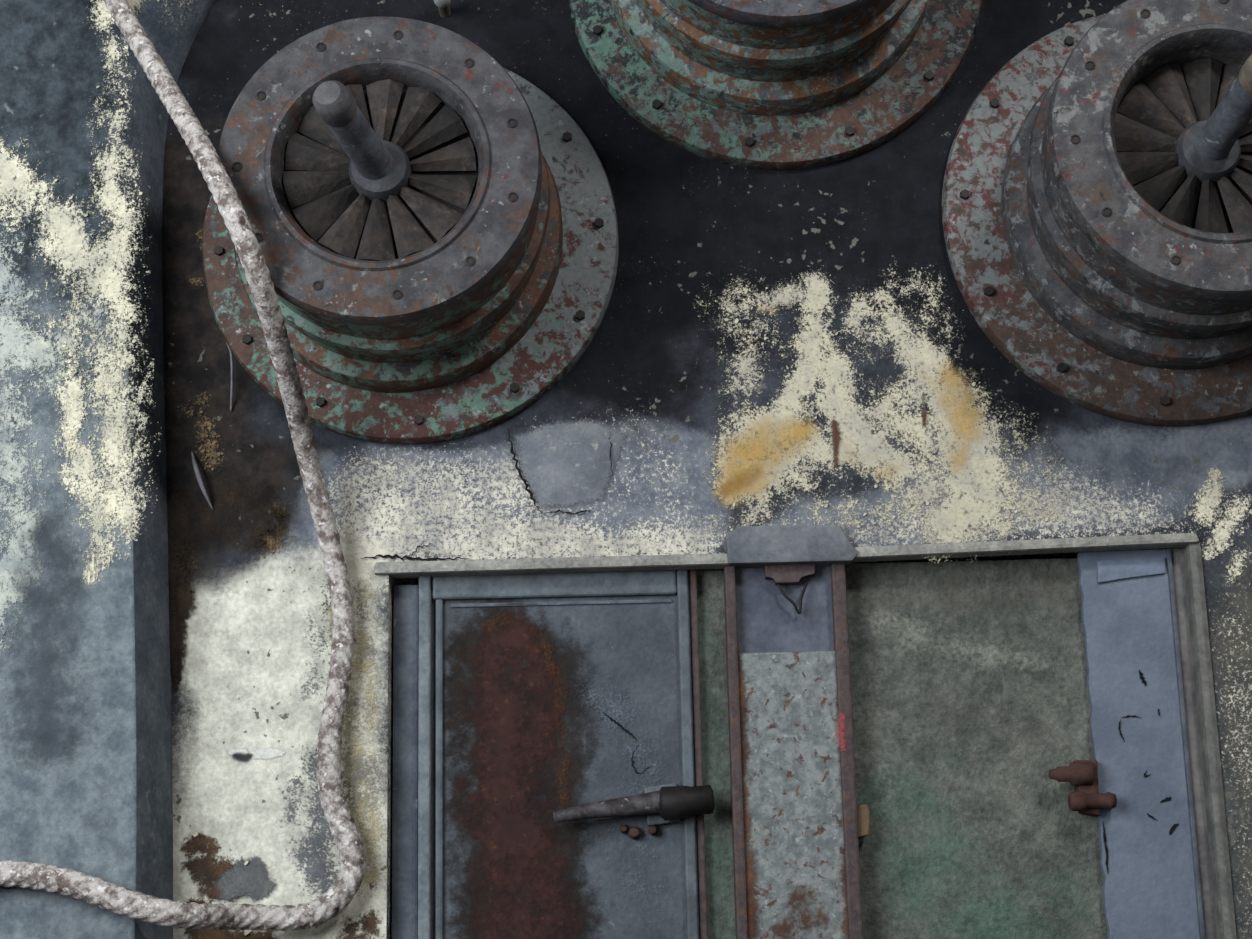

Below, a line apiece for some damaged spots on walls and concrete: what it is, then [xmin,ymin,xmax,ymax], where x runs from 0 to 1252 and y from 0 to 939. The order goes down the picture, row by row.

water stain [167,481,288,691]
rust [443,599,603,939]